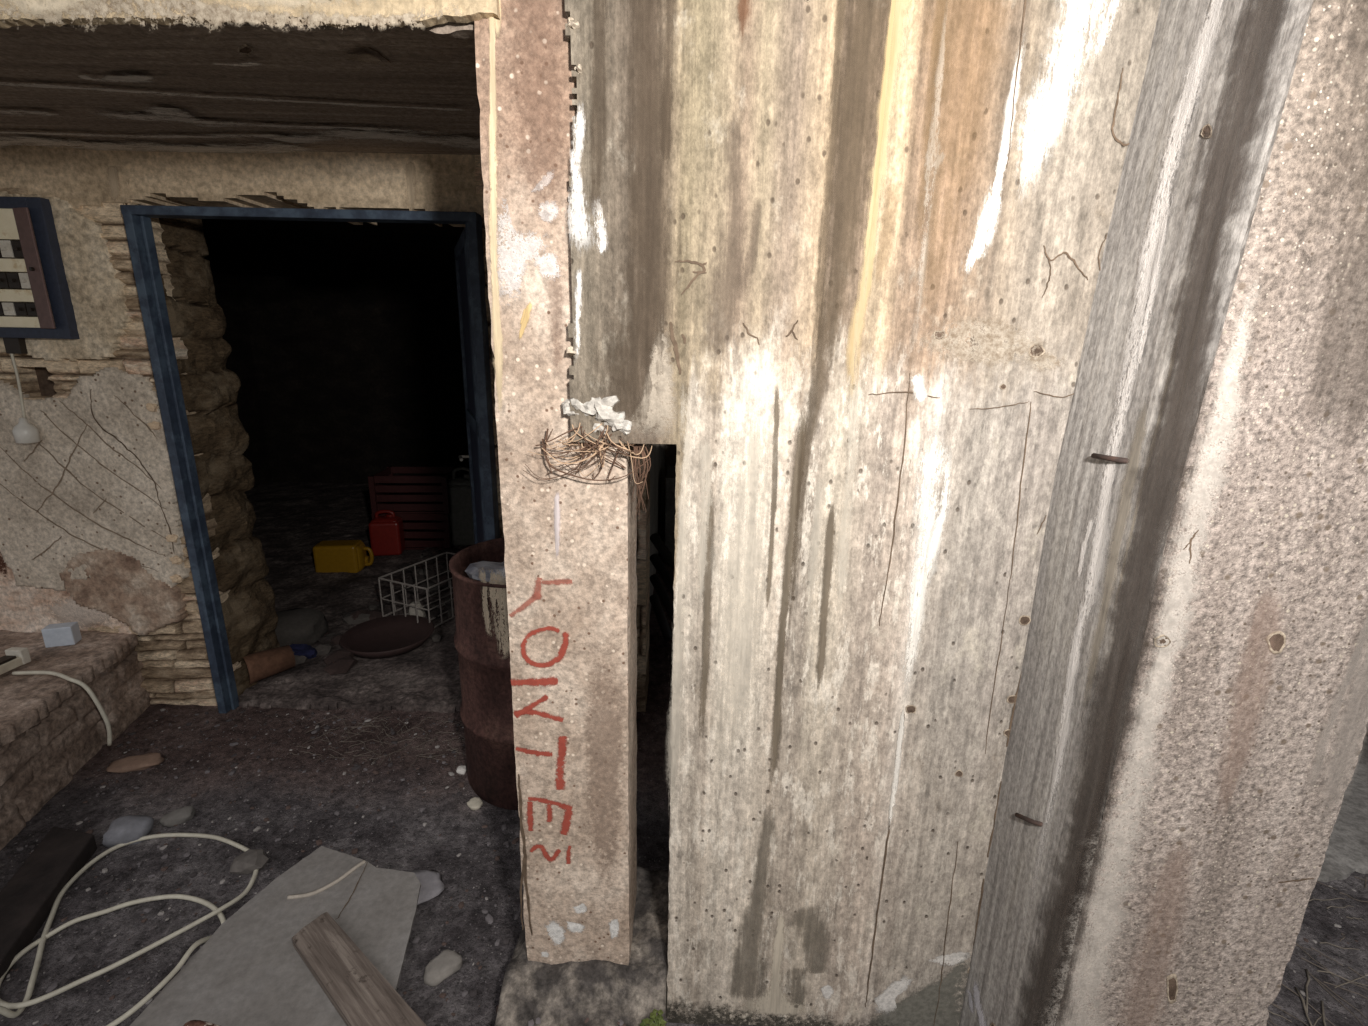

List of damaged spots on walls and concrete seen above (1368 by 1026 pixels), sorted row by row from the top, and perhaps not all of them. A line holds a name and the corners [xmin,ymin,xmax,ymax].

water stain [496,0,607,354]
water stain [608,0,675,417]
water stain [919,26,945,301]
water stain [966,0,1122,272]
peeling [48,589,110,627]
crack [90,390,174,551]
water stain [699,490,714,727]
water stain [766,0,909,782]
water stain [912,374,927,402]
water stain [902,432,952,684]
water stain [1019,0,1288,1026]
water stain [666,815,986,1026]